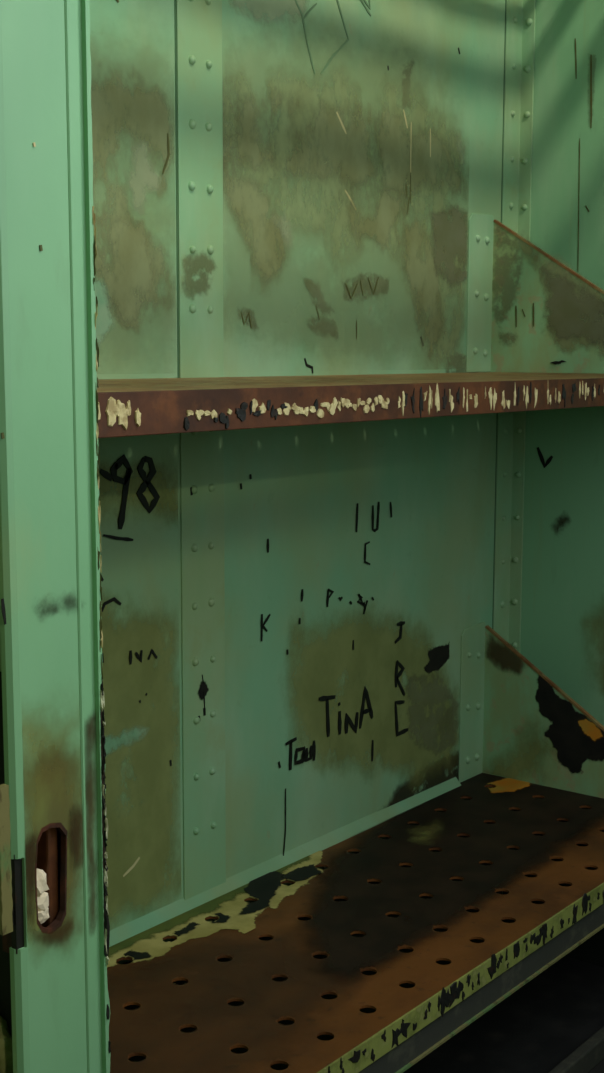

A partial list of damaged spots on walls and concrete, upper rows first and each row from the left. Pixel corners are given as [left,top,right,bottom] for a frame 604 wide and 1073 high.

peeling [492,229,604,354]
peeling [183,381,600,431]
peeling [91,75,323,967]
peeling [536,675,604,773]
corrosion [24,717,96,941]
peeling [381,890,604,1048]
peeling [328,1048,375,1073]